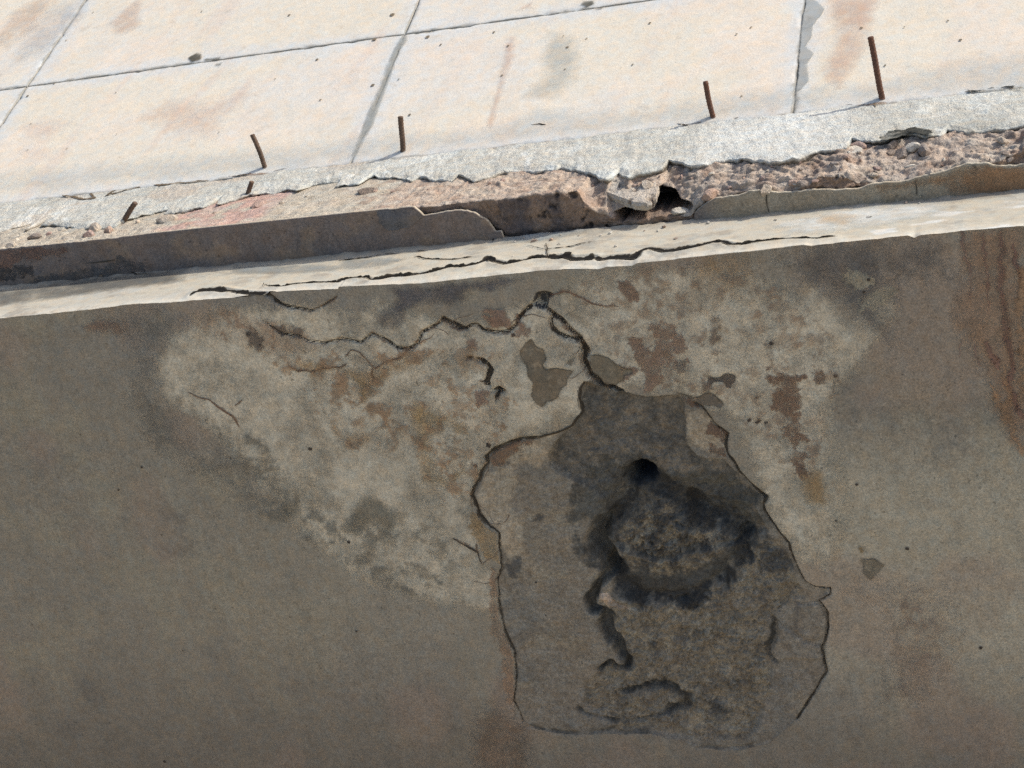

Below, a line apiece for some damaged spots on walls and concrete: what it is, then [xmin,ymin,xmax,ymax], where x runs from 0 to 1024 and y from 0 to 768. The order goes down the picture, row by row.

spalling [361,37,406,136]
spalling [0,129,1024,249]
crack [188,235,835,719]
leakage [158,245,893,609]
flaking render [473,355,830,750]